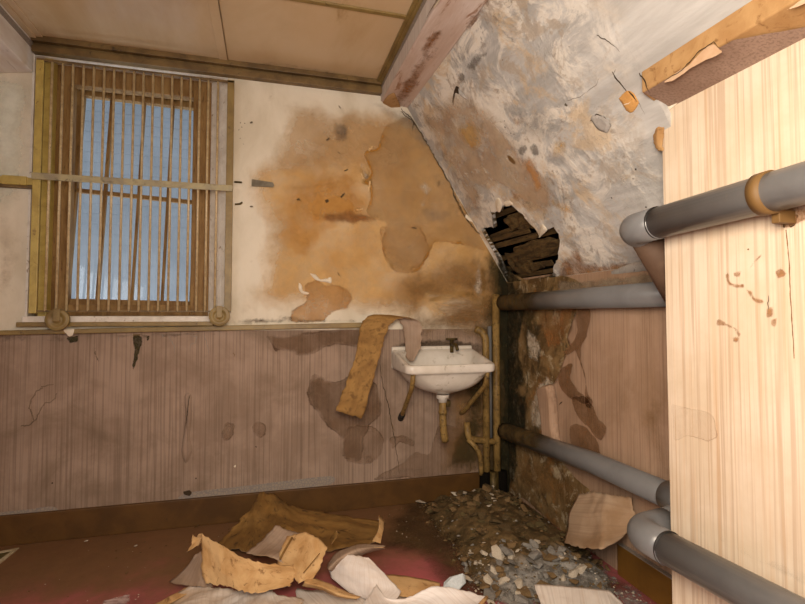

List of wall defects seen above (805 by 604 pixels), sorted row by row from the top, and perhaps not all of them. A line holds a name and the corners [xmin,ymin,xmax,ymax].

flaking render [481,198,580,295]
damp [132,334,149,369]
peeling [291,273,351,322]
damp [260,115,520,499]
flaking render [507,309,579,434]
damp [558,309,606,454]
rust [726,273,776,323]
flaking render [508,441,590,533]